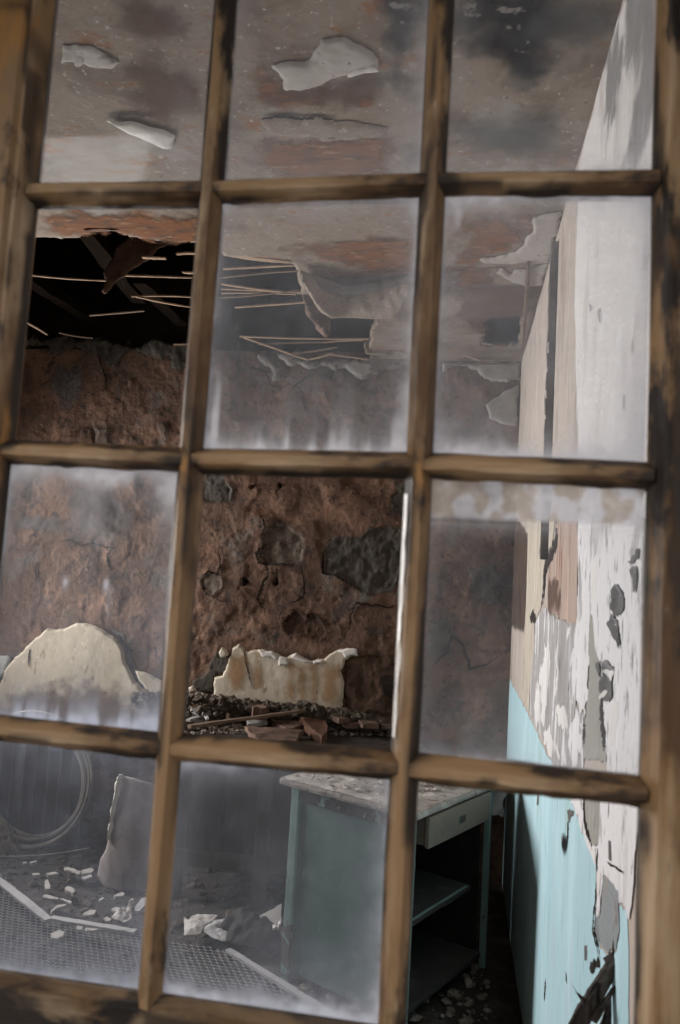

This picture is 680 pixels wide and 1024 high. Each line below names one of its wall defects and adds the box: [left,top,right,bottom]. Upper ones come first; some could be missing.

flaking render [271,37,379,91]
peeling [578,0,656,170]
peeling [107,121,175,149]
flaking render [480,212,563,286]
spalling [25,335,187,371]
flaking render [257,349,411,383]
peeling [574,204,651,462]
spalling [203,475,233,503]
spalling [321,489,405,596]
spalling [281,608,327,643]
peeling [511,492,646,774]
peeling [567,799,637,973]